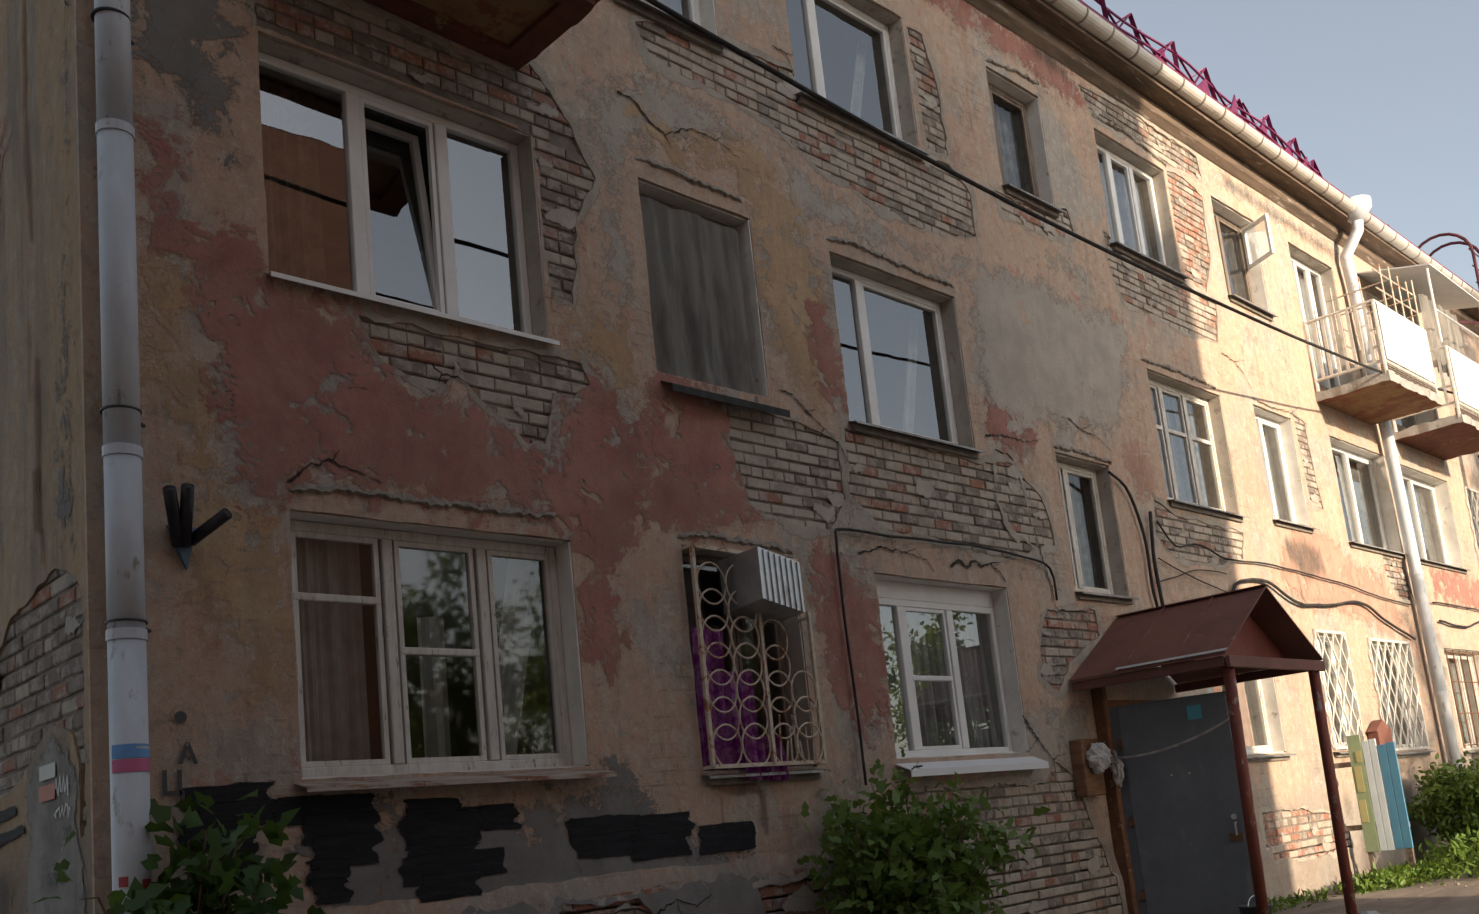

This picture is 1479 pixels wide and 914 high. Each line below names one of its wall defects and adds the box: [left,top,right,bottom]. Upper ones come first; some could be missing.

spalling [130,0,978,319]
crack [287,450,382,483]
peeling [152,456,558,722]
spalling [0,567,89,835]
flaking render [285,792,422,909]
flaking render [460,755,838,914]
spalling [1257,803,1354,865]